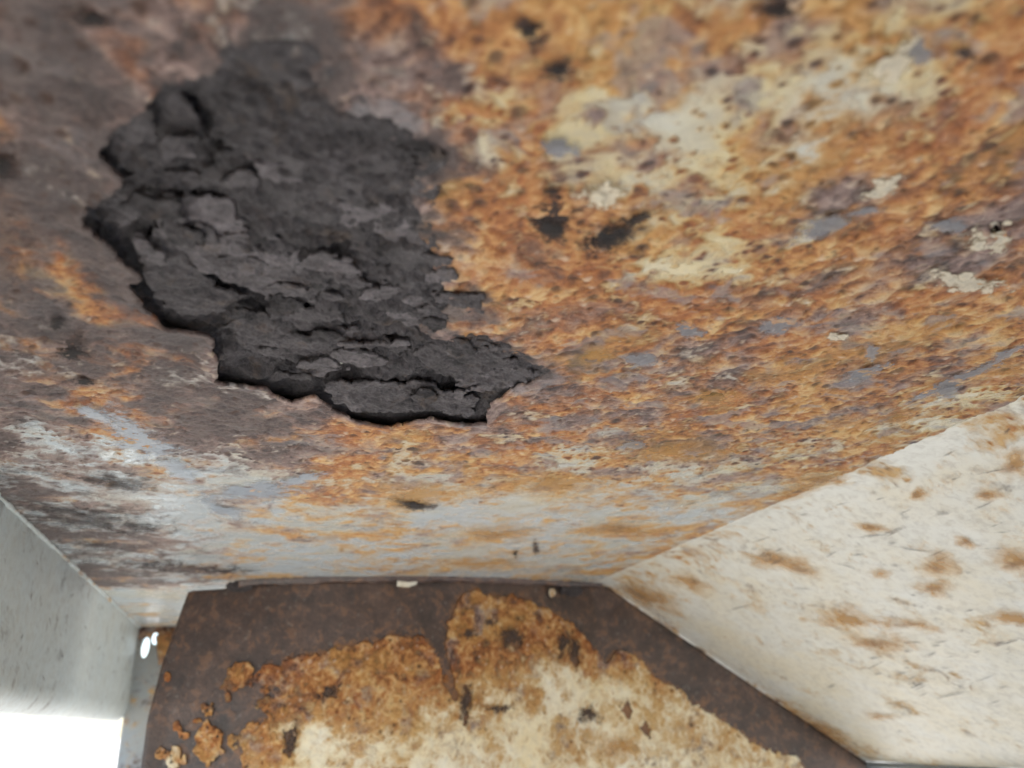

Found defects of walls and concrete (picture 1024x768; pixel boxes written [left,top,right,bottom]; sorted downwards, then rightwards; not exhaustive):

corrosion [752,0,802,21]
corrosion [514,17,548,55]
corrosion [538,57,573,82]
corrosion [526,188,655,253]
corrosion [50,318,92,360]
corrosion [64,473,155,493]
corrosion [26,506,159,551]
corrosion [558,630,581,659]
corrosion [315,681,342,703]
corrosion [460,685,472,723]
corrosion [578,705,601,723]
corrosion [282,725,299,753]